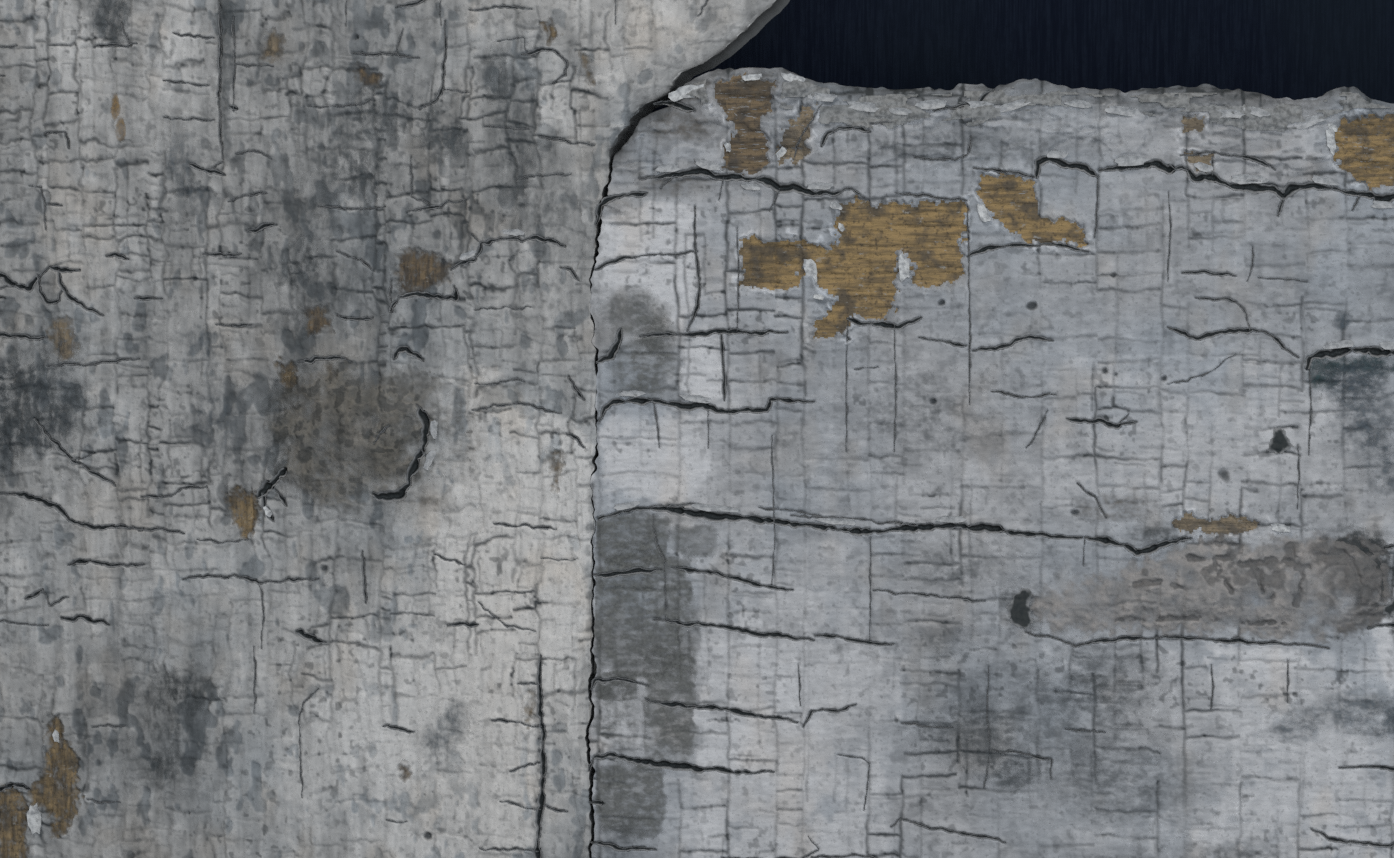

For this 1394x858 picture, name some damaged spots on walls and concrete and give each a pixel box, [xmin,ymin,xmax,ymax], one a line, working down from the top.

crack [162,0,277,257]
crack [345,0,568,110]
peeling [668,72,1394,190]
crack [0,252,140,367]
peeling [737,173,1088,340]
crack [311,89,1394,729]
crack [0,418,318,712]
peeling [1172,512,1291,536]
peeling [0,717,84,858]
crack [447,602,774,858]
leakage [594,515,695,834]
crack [1311,829,1394,848]